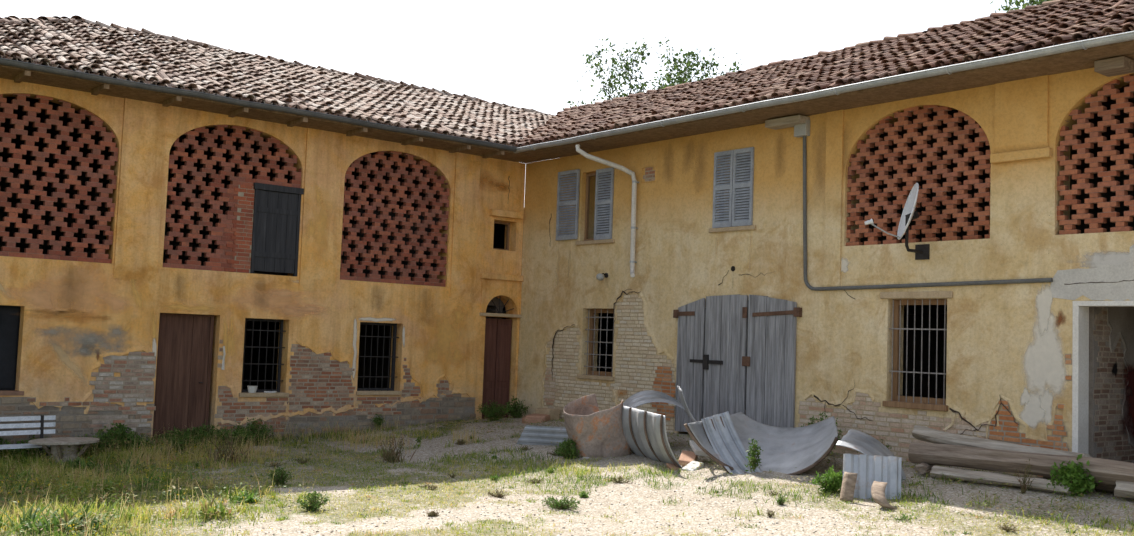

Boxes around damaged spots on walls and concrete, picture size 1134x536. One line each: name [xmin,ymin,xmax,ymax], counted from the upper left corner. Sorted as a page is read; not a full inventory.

spalling [0,346,156,452]
spalling [215,338,476,440]
spalling [541,289,676,433]
spalling [798,388,1069,462]